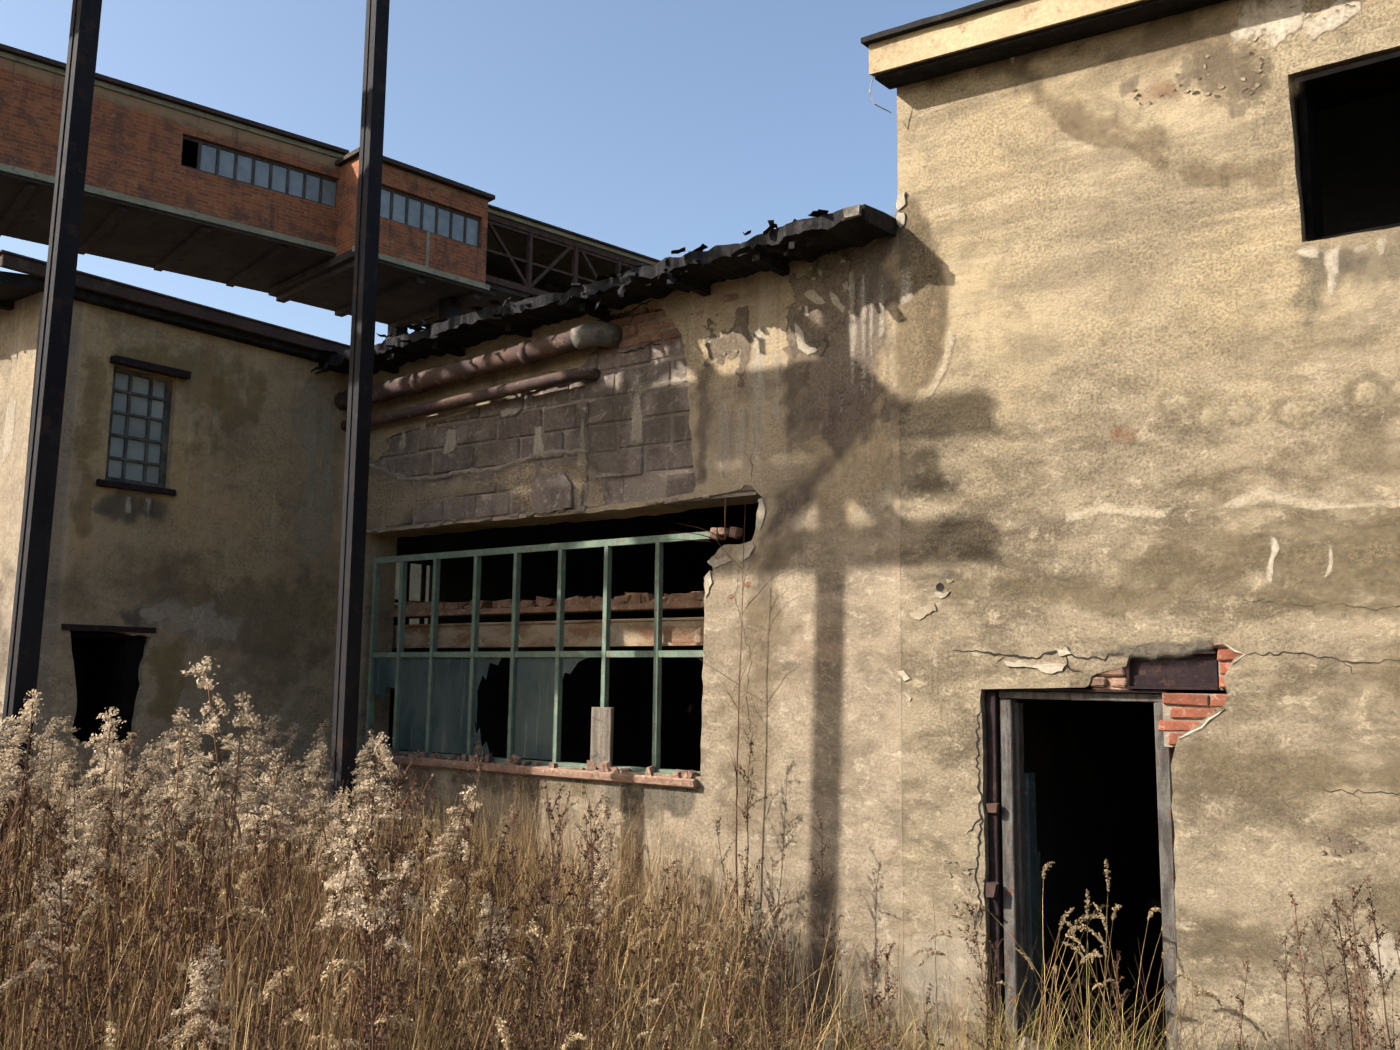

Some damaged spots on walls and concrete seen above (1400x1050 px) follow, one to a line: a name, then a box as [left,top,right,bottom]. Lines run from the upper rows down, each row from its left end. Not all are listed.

peeling [1132,0,1361,105]
leakage [988,57,1167,168]
peeling [785,253,858,398]
leakage [768,202,954,532]
leakage [3,399,16,459]
flaking render [366,293,766,598]
crack [953,640,1212,674]
flaking render [1090,665,1133,690]
flaking render [1158,643,1245,747]
crack [1243,651,1392,674]